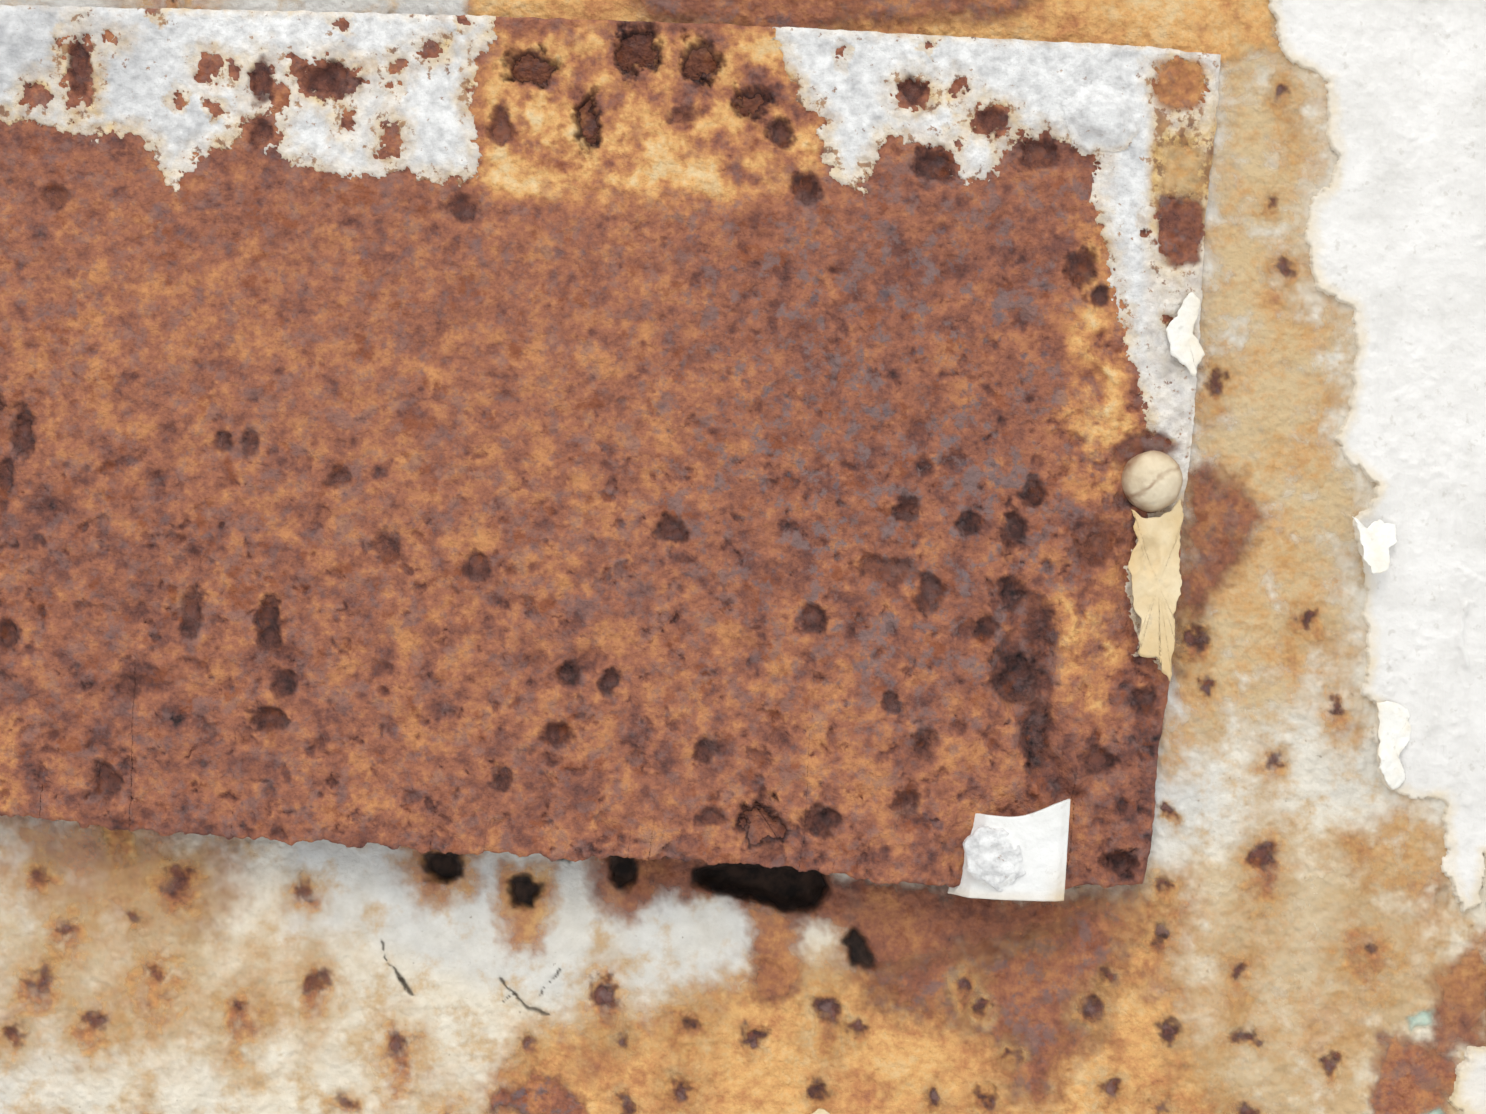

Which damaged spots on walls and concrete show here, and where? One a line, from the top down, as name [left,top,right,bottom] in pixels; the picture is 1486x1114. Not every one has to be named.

spalling [70,45,91,93]
hole [252,60,271,102]
spalling [1064,248,1107,306]
peeling [1166,292,1205,377]
rust [468,0,1355,760]
peeling [1352,516,1397,574]
peeling [1377,701,1411,790]
rust [401,846,477,904]
rust [590,856,716,920]
rust [2,820,229,1062]
rust [485,863,1266,1114]
rust [1370,933,1486,1114]